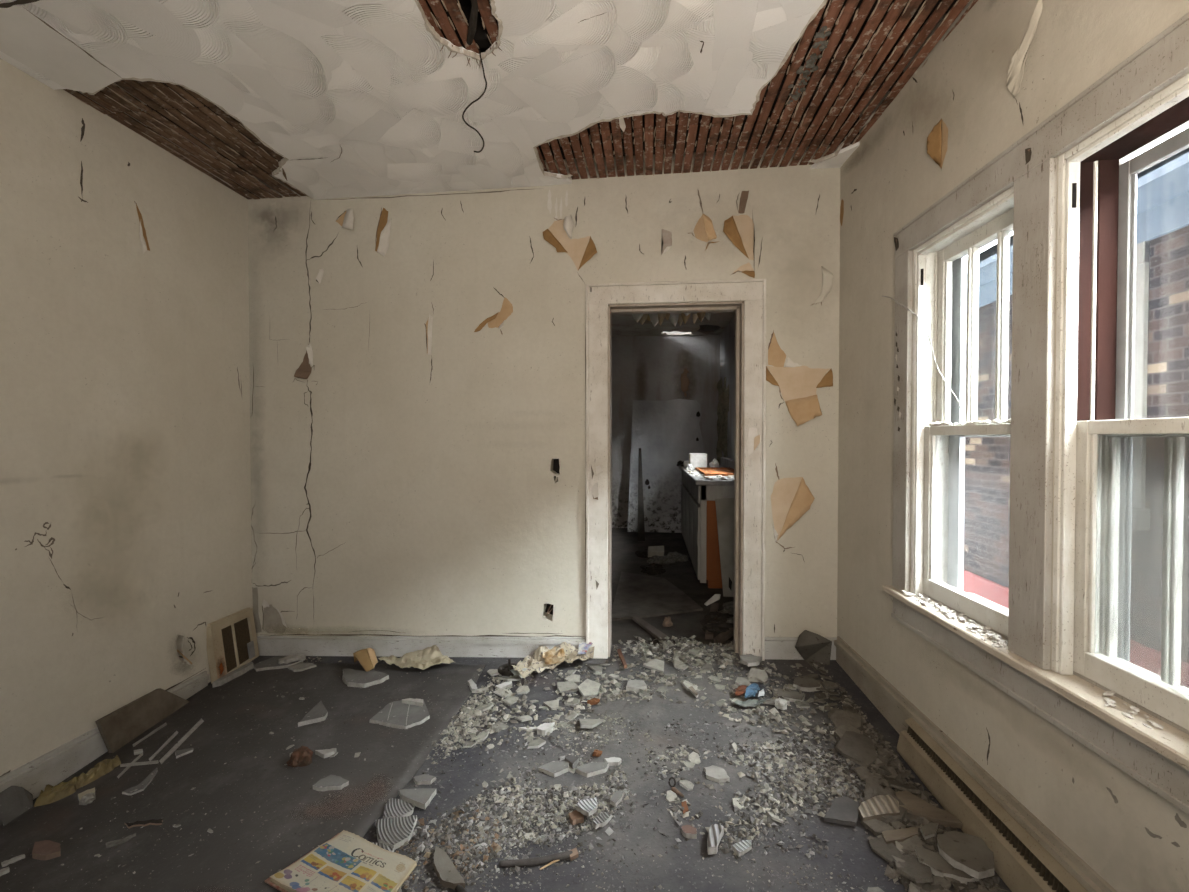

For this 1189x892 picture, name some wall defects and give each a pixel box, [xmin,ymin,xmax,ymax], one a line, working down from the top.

crack [0,0,119,76]
spalling [415,0,503,61]
peeling [1007,0,1043,123]
peeling [927,119,948,168]
peeling [543,215,597,270]
peeling [688,191,755,278]
peeling [474,288,513,334]
peeling [766,330,833,427]
crack [251,381,402,636]
peeling [771,464,815,552]
crack [49,558,106,627]
crack [445,631,582,639]